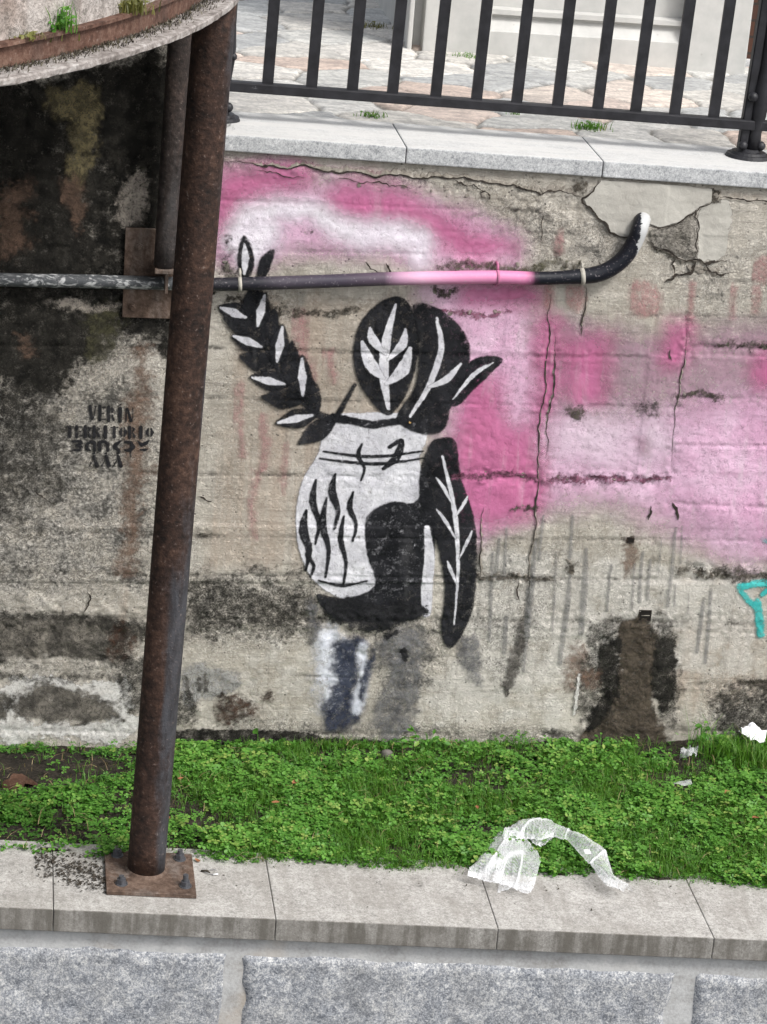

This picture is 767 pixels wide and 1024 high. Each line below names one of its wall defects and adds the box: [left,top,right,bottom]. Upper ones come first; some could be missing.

damp [0,49,166,275]
crack [224,157,729,282]
damp [0,286,170,535]
rust [116,344,152,577]
crack [516,296,556,601]
crack [669,329,689,472]
damp [0,610,146,748]
rust [106,621,137,663]
damp [186,564,326,645]
damp [176,691,383,747]
damp [553,532,687,744]
damp [696,593,712,663]